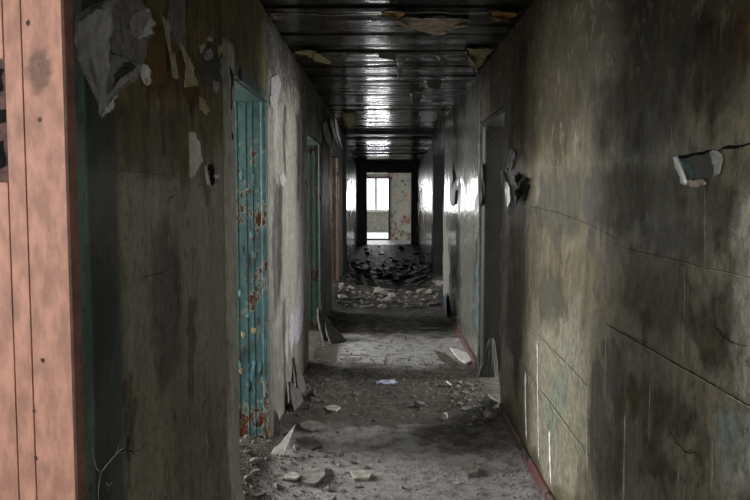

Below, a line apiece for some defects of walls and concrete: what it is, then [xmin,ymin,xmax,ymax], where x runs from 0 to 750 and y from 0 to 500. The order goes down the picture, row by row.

peeling [74,0,188,119]
peeling [374,51,397,61]
peeling [380,9,471,36]
peeling [189,132,219,188]
peeling [500,148,531,217]
spalling [673,150,723,188]
crack [720,142,750,150]
crack [531,206,750,279]
damp [732,195,750,396]
damp [527,280,589,494]
crack [606,324,750,408]
damp [716,412,750,487]